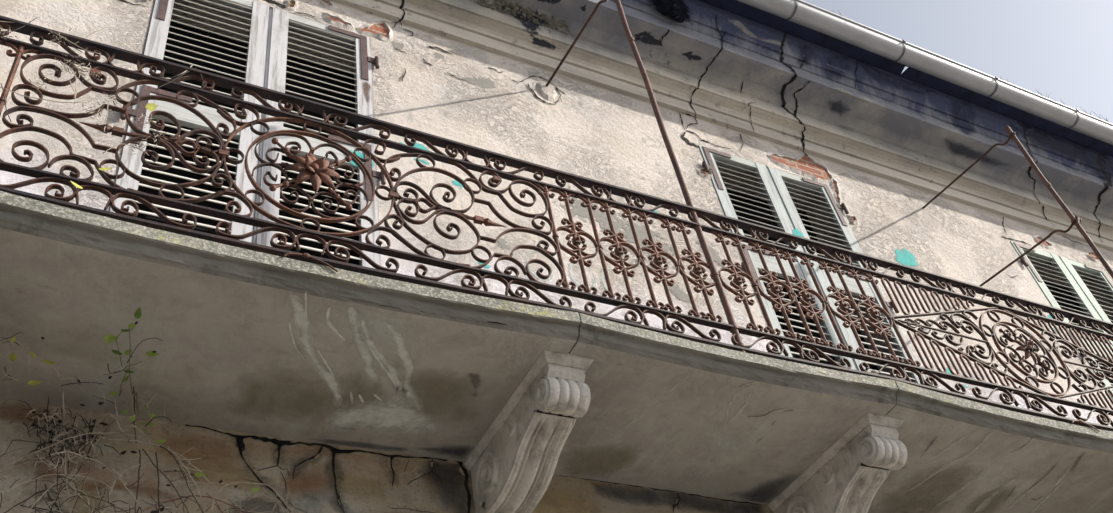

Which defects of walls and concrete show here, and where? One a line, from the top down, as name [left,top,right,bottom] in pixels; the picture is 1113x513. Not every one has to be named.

spalling [316,0,404,50]
crack [379,0,567,105]
peeling [463,75,495,88]
crack [679,14,754,151]
crack [778,33,814,161]
spalling [766,153,859,225]
water stain [948,141,989,161]
crack [1023,124,1113,247]
water stain [288,293,452,434]
crack [185,424,471,513]